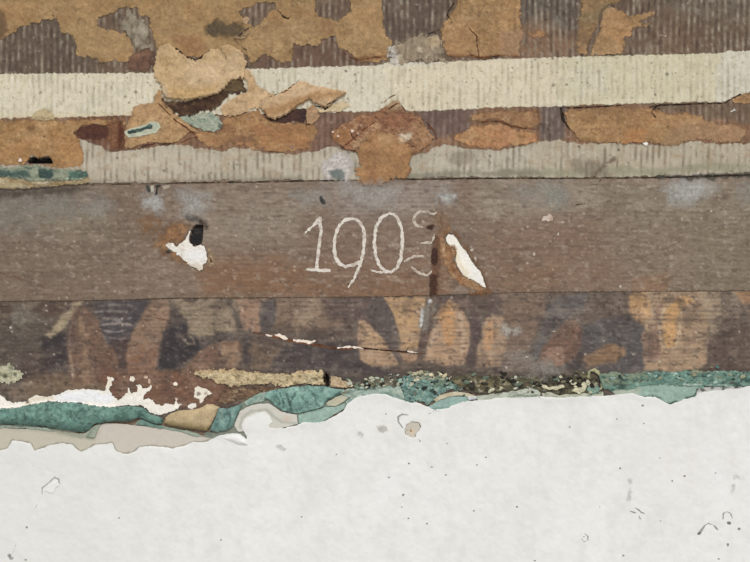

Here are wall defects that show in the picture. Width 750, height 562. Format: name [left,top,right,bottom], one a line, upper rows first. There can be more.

flaking render [576,0,655,56]
flaking render [0,0,545,190]
flaking render [564,106,746,146]
flaking render [730,93,750,112]
flaking render [155,215,213,271]
flaking render [437,226,490,296]
crack [252,332,425,354]
peeling [0,368,351,445]
peeling [397,413,420,440]
peeling [397,366,750,414]